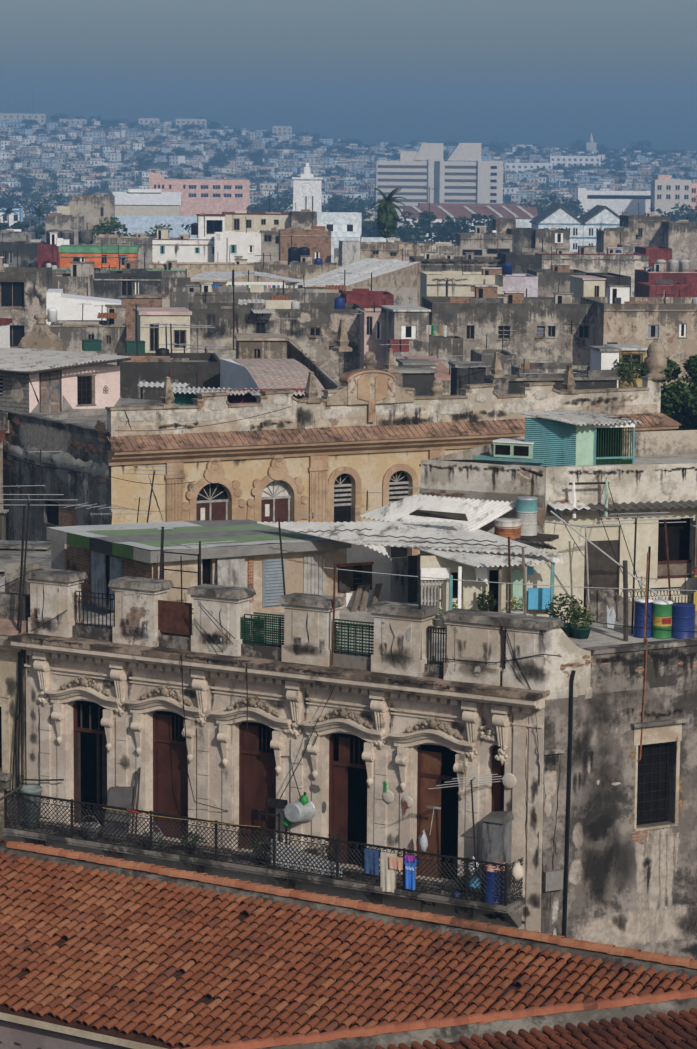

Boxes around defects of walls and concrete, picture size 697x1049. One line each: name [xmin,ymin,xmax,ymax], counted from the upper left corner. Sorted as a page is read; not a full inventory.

damp [424,464,542,496]
damp [570,467,697,482]
damp [120,619,147,638]
damp [466,645,491,674]
damp [513,646,545,680]
damp [569,698,697,955]